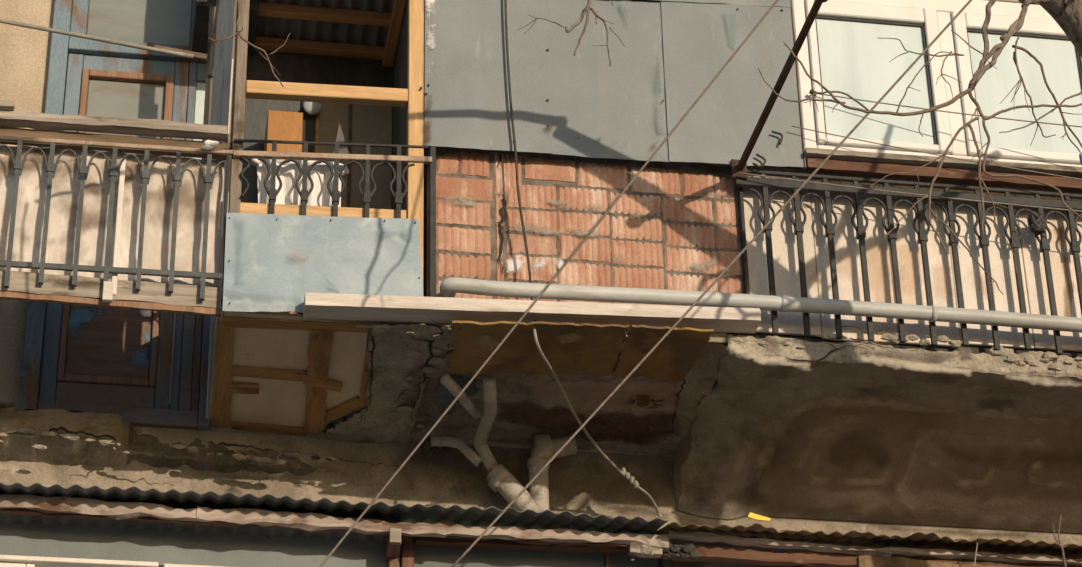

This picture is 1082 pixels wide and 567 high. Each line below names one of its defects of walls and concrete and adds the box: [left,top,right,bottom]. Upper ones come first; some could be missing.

crack [498,199,506,273]
crack [358,318,452,435]
peeling [404,323,477,415]
peeling [504,376,678,413]
peeling [729,336,809,367]
peeling [859,358,970,374]
spalling [880,332,961,348]
spalling [988,346,1082,385]
crack [49,426,191,459]
crack [219,442,398,467]
water stain [730,395,1069,482]